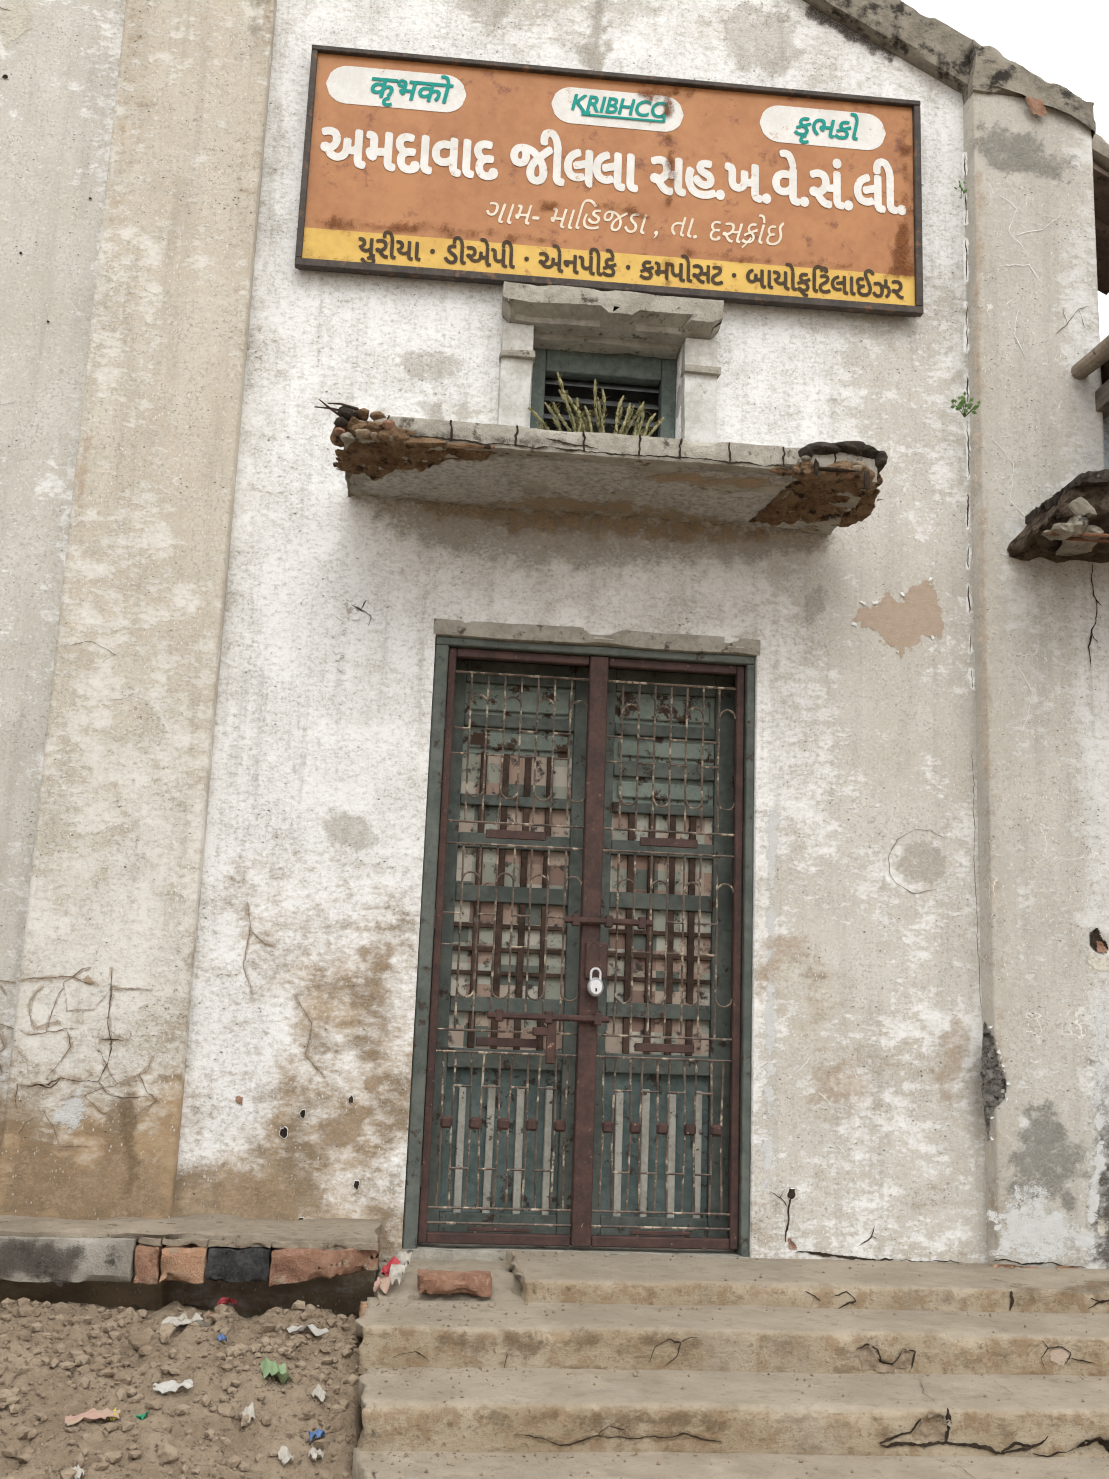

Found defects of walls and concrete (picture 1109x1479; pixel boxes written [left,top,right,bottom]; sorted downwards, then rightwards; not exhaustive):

leakage [805,5,895,62]
spalling [314,399,508,481]
spalling [748,441,888,527]
spalling [1042,496,1109,556]
leakage [359,943,391,1030]
crack [0,967,157,1147]
leakage [320,1047,380,1164]
spalling [980,1022,1010,1141]
leakage [986,988,1109,1265]
crack [771,1188,1109,1311]
crack [516,1425,721,1446]
crack [857,1341,1109,1478]